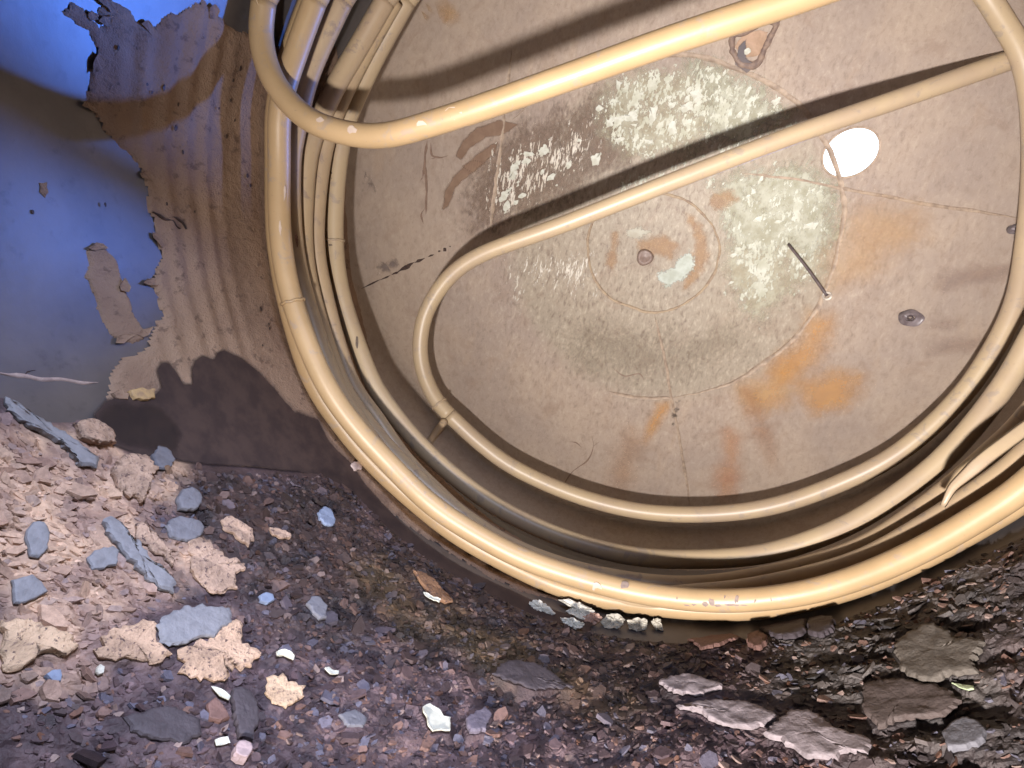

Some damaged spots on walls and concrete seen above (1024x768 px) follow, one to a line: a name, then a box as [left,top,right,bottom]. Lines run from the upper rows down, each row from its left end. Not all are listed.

leakage [443,59,797,224]
peeling [62,0,664,632]
crack [361,246,451,289]
leakage [499,244,600,316]
leakage [657,253,695,288]
leakage [706,158,840,329]